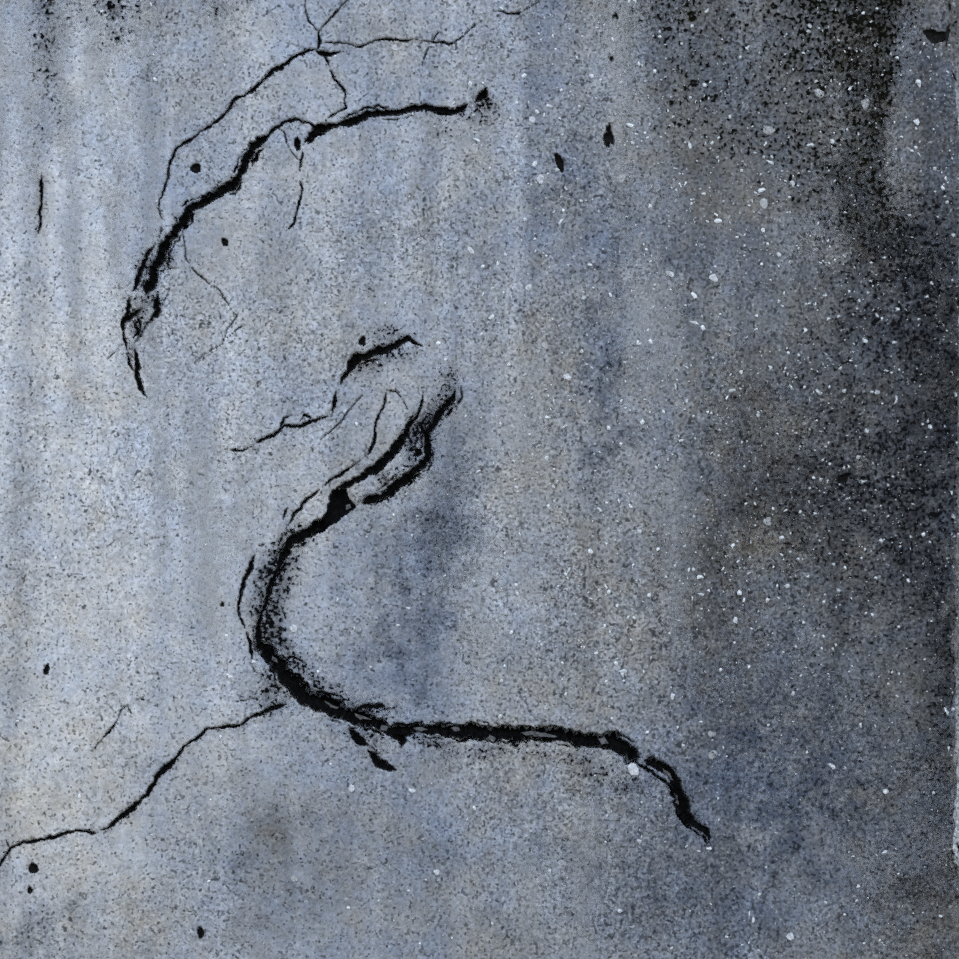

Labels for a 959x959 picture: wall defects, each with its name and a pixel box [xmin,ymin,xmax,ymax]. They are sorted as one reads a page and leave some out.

damp [16,0,73,135]
damp [94,0,148,67]
crack [107,0,539,396]
crack [227,335,422,452]
damp [573,313,621,403]
damp [662,0,959,959]
crack [0,390,710,865]